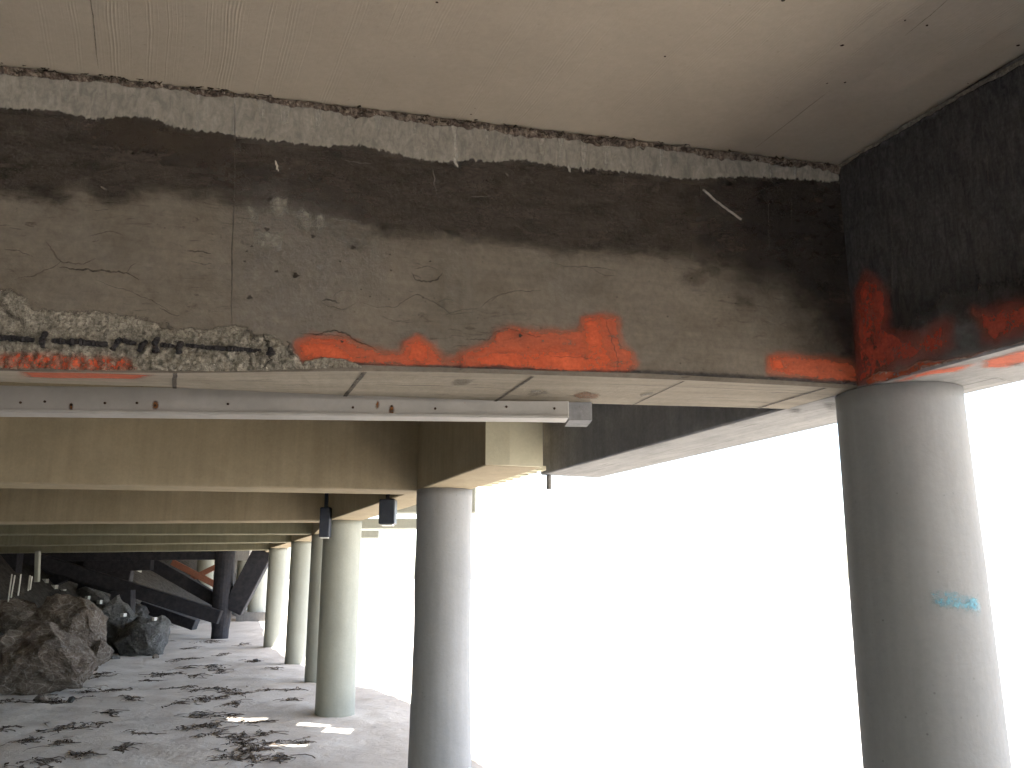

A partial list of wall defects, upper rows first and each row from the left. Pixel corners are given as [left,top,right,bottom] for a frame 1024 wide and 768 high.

water stain [0,56,1024,385]
crack [12,232,179,316]
spalling [0,289,362,372]
crack [301,266,533,351]